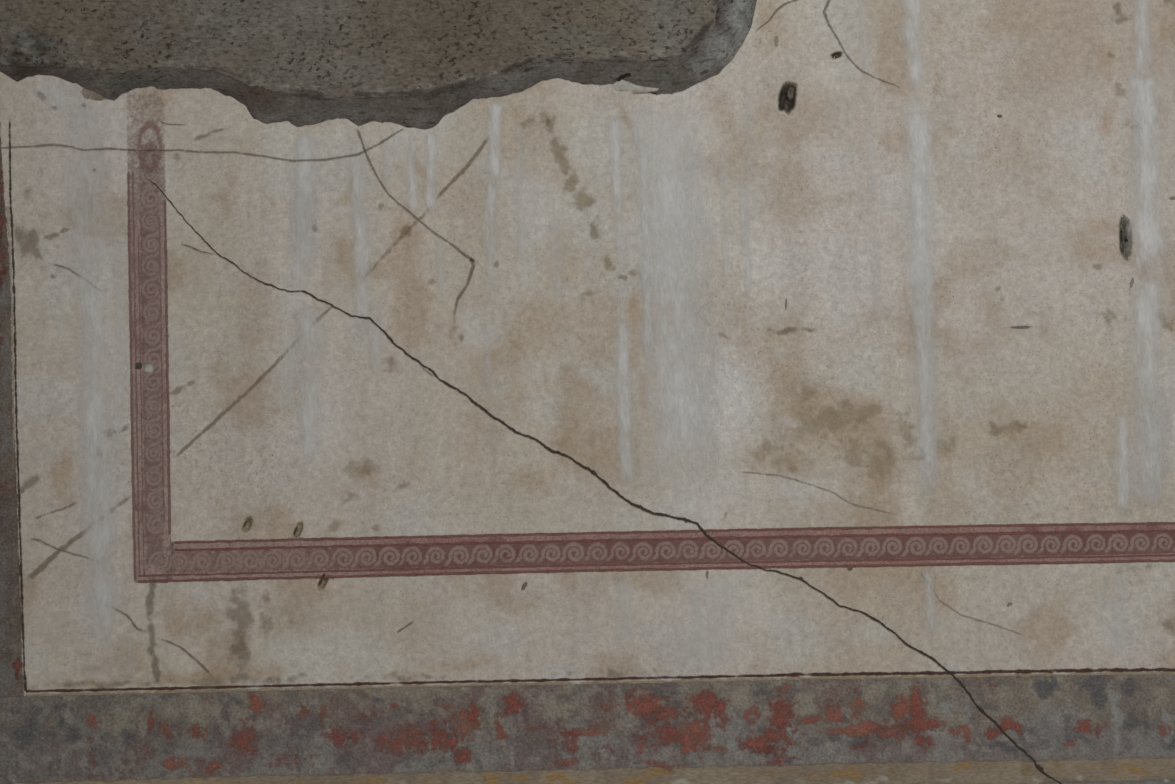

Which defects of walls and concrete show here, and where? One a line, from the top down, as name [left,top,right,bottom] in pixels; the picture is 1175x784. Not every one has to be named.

crack [34,539,89,559]
damp [351,145,380,368]
spalling [0,0,756,130]
damp [384,133,437,211]
damp [483,103,502,272]
crack [152,182,1062,784]
damp [616,313,633,478]
damp [635,115,717,474]
damp [903,0,923,82]
damp [907,103,936,476]
damp [1116,282,1162,507]
damp [1131,0,1163,268]